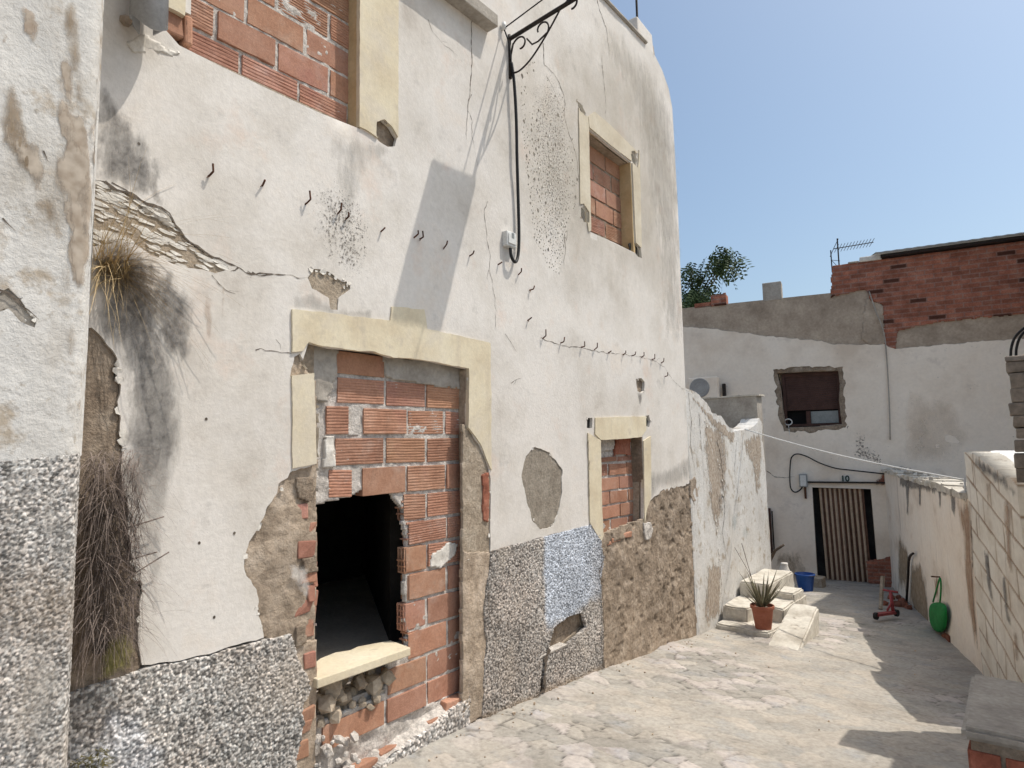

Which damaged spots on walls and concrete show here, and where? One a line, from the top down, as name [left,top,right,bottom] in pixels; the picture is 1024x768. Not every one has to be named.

water stain [67,7,75,32]
water stain [6,93,29,168]
water stain [108,106,149,190]
water stain [99,244,186,485]
peeling [57,62,232,284]
crack [90,118,307,294]
peeling [308,267,352,310]
water stain [312,181,370,265]
peeling [70,328,144,692]
spalling [242,459,318,768]
spalling [522,447,562,529]
spalling [600,398,761,668]